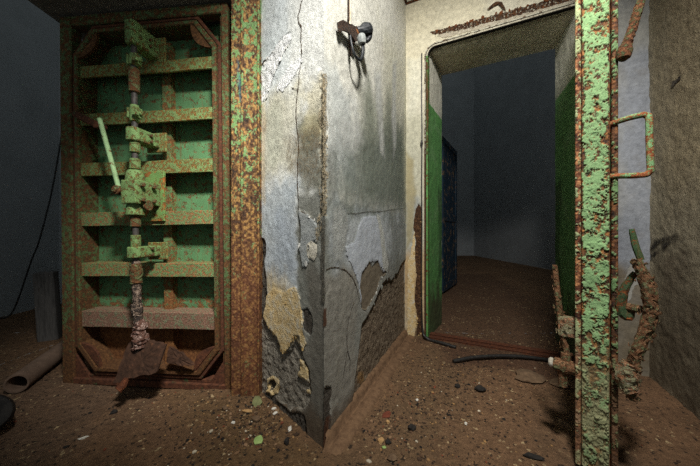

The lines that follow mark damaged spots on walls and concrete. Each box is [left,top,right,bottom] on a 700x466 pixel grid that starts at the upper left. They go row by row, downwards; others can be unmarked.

rust [430,0,575,38]
crack [291,1,313,234]
spalling [298,74,329,304]
water stain [374,72,384,154]
rust [166,346,195,366]
spalling [262,239,313,434]
spalling [346,214,405,393]